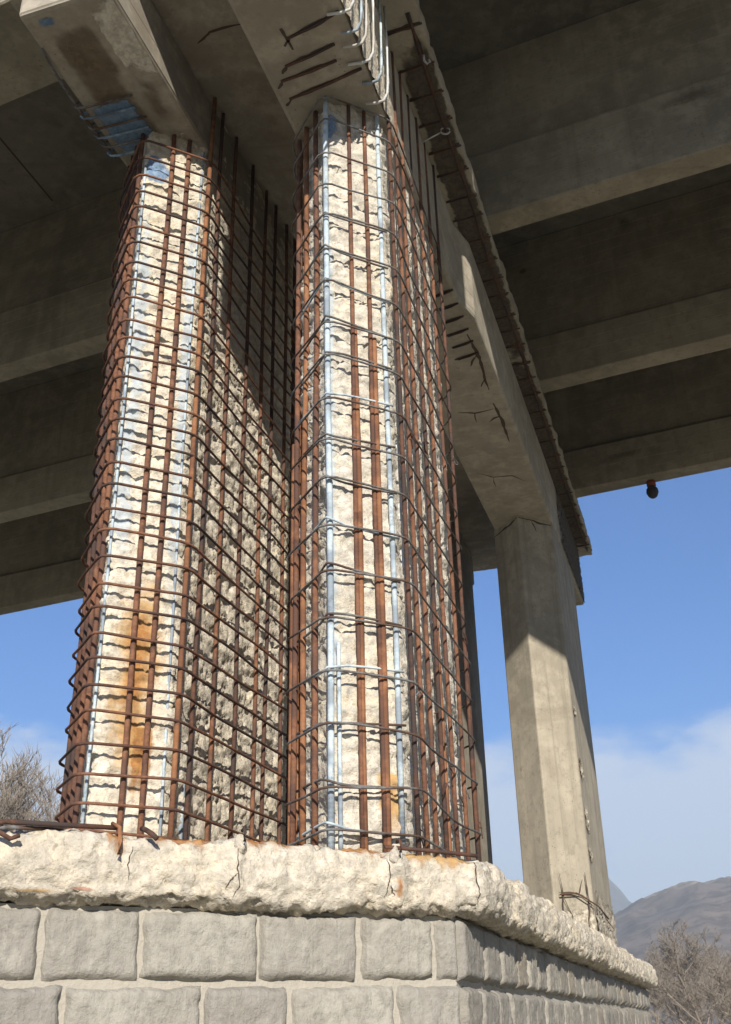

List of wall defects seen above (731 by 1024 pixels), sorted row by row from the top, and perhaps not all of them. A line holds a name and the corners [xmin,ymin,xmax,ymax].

spalling [278,0,590,603]
crack [459,334,510,442]
crack [495,517,551,537]
rust [110,603,158,787]
spalling [140,826,159,841]
spalling [384,845,478,858]
crack [225,856,240,896]